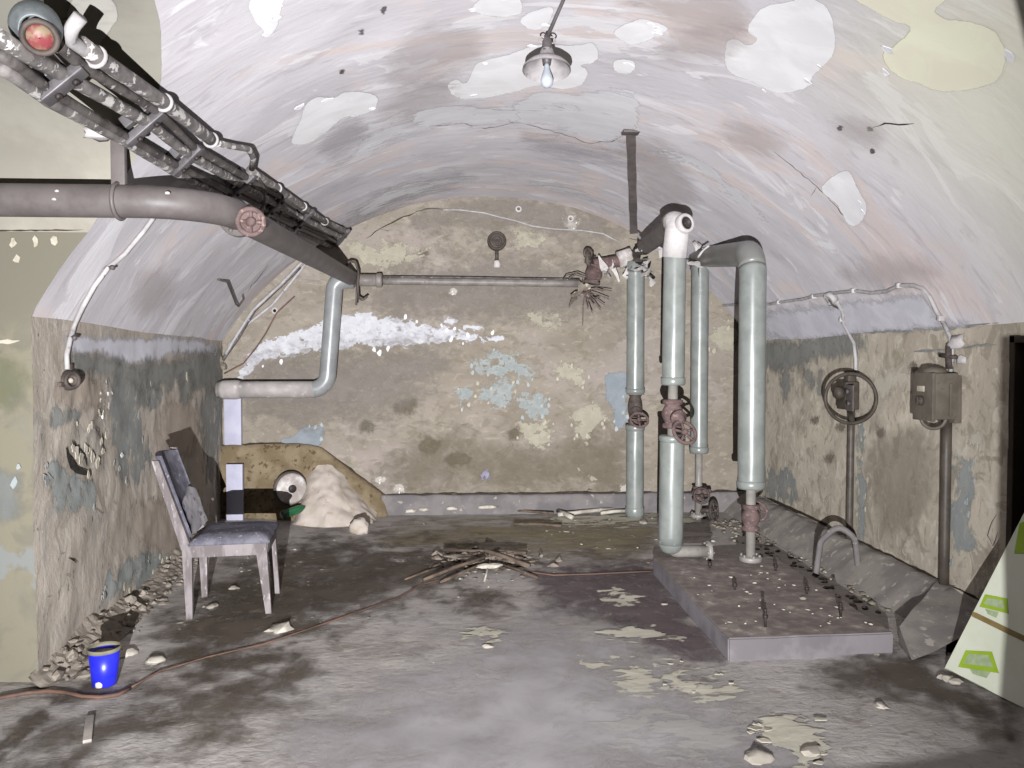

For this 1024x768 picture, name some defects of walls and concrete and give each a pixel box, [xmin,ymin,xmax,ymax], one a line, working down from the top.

peeling [469,0,554,30]
peeling [448,43,598,99]
peeling [614,19,668,45]
peeling [724,0,835,93]
peeling [856,0,1015,92]
peeling [291,92,378,145]
crack [367,208,461,238]
peeling [822,171,867,226]
water stain [71,343,223,404]
peeling [237,319,323,381]
peeling [338,312,557,451]
flaking render [53,372,127,484]